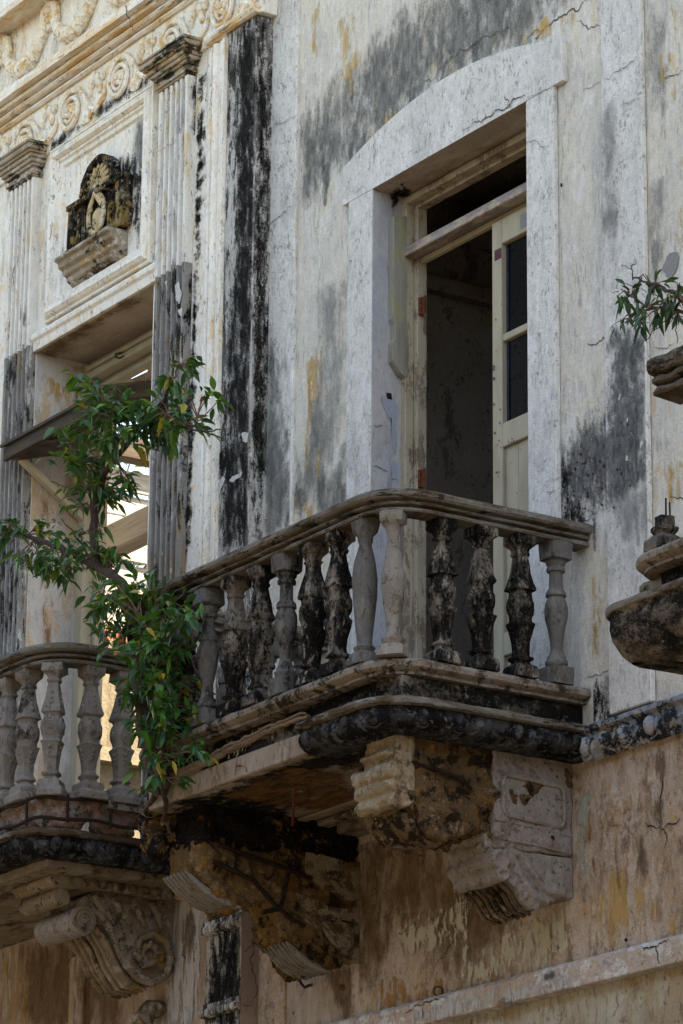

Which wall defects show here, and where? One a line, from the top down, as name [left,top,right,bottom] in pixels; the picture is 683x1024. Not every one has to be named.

damp [300,0,548,205]
crack [407,1,599,92]
crack [464,87,551,130]
damp [183,73,206,359]
damp [390,189,411,210]
damp [218,20,344,552]
damp [179,373,197,560]
damp [561,327,647,550]
crack [623,752,681,878]
damp [184,911,195,947]
damp [205,930,240,1005]
peeling [378,897,571,1024]